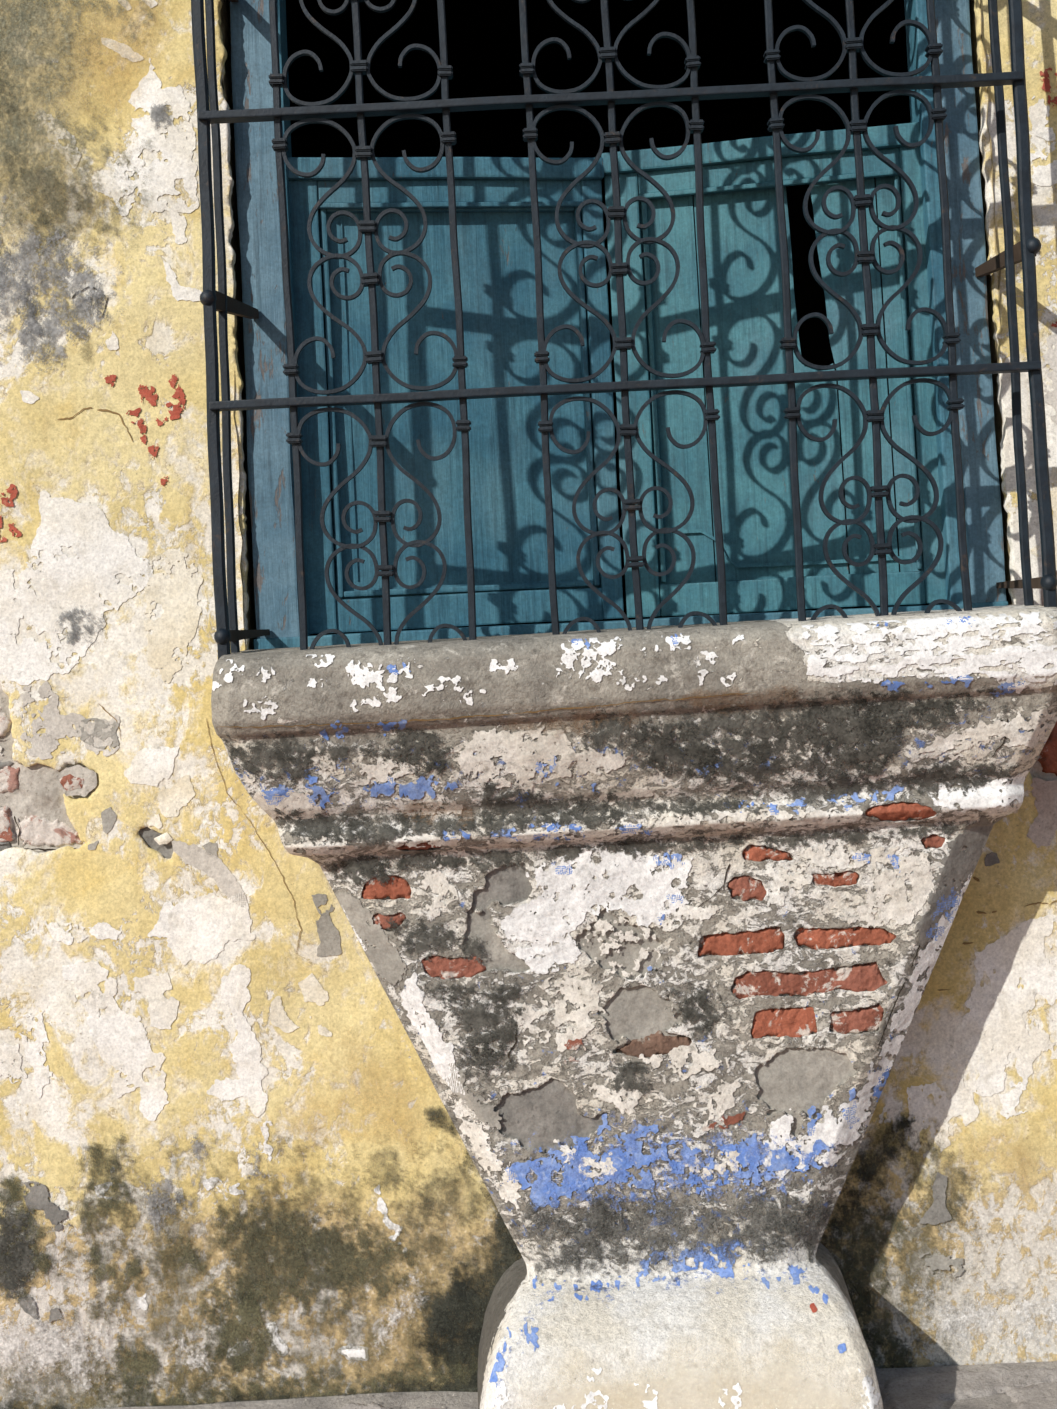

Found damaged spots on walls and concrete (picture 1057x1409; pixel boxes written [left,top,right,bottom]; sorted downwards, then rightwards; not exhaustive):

leakage [0,0,137,374]
leakage [149,101,171,128]
peeling [126,374,186,458]
peeling [0,484,153,853]
peeling [212,659,278,720]
leakage [223,727,454,787]
peeling [556,636,668,691]
leakage [274,687,1020,887]
peeling [642,633,744,687]
peeling [62,746,255,1121]
leakage [386,916,531,1084]
leakage [0,1115,1057,1409]